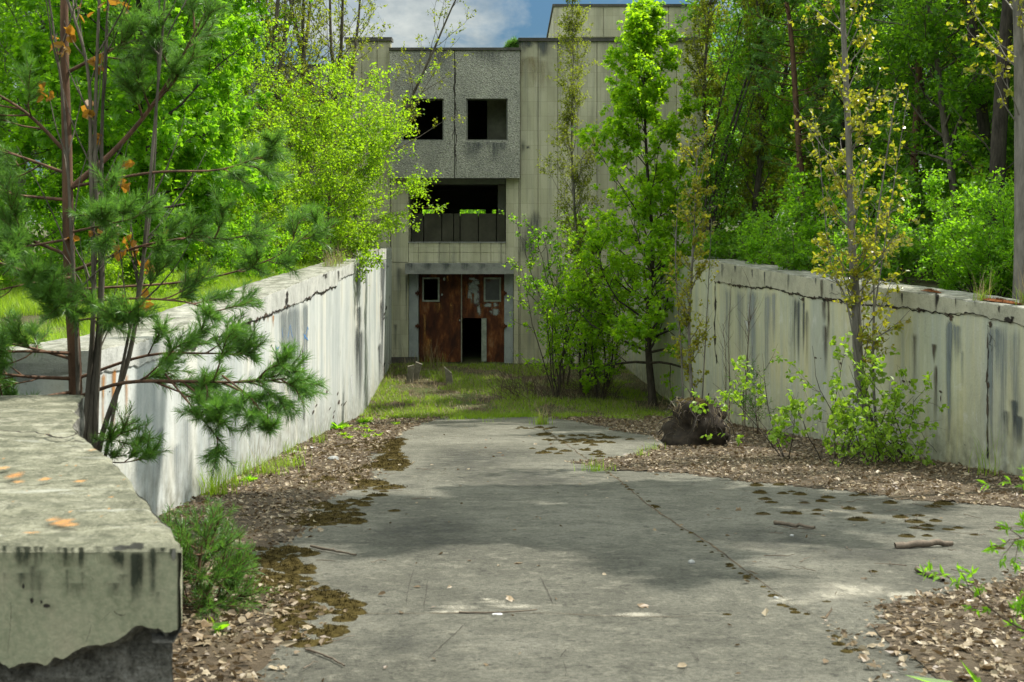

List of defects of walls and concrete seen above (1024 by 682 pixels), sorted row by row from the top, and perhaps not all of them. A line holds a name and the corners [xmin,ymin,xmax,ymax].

spalling [73,399,96,450]
crack [164,261,383,367]
damp [351,262,370,394]
damp [378,249,390,367]
peeling [468,278,498,315]
crack [714,266,1023,463]
damp [932,323,959,417]
damp [988,330,1022,438]
damp [3,546,43,582]
damp [110,548,173,593]
crack [545,429,832,618]
spalling [0,615,184,671]